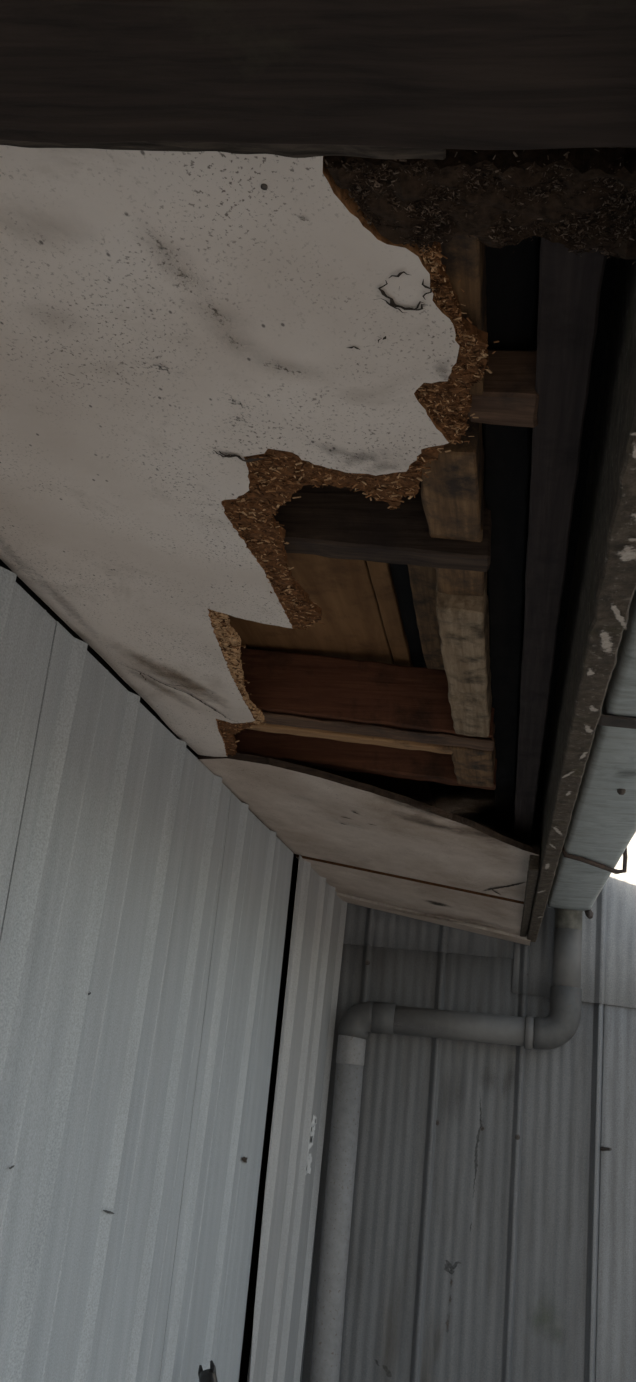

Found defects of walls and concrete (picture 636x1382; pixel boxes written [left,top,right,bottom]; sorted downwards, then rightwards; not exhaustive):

peeling [222,242,499,630]
peeling [209,609,266,756]
peeling [599,603,627,653]